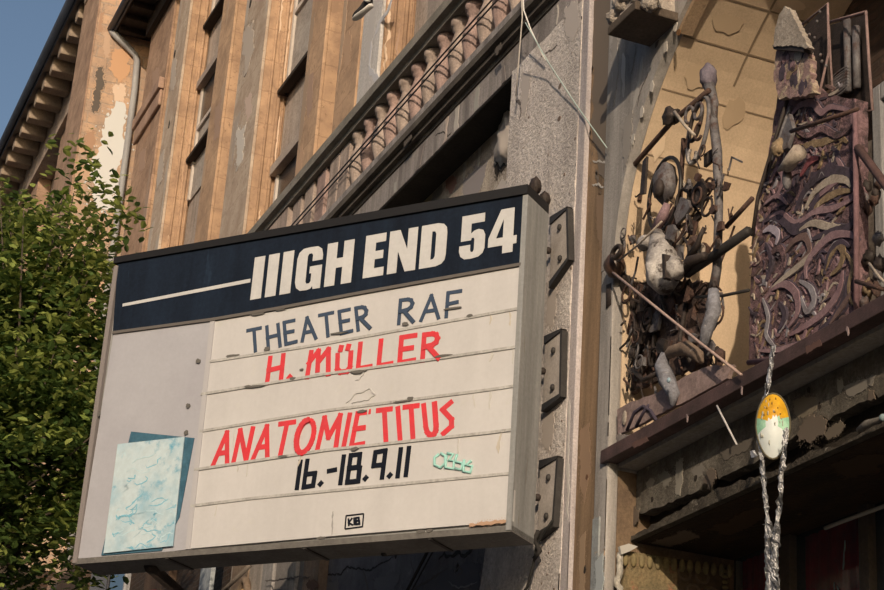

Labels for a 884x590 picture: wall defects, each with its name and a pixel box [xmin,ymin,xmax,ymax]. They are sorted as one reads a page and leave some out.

peeling [83,12,134,215]
spalling [790,387,846,449]
crack [265,556,395,582]